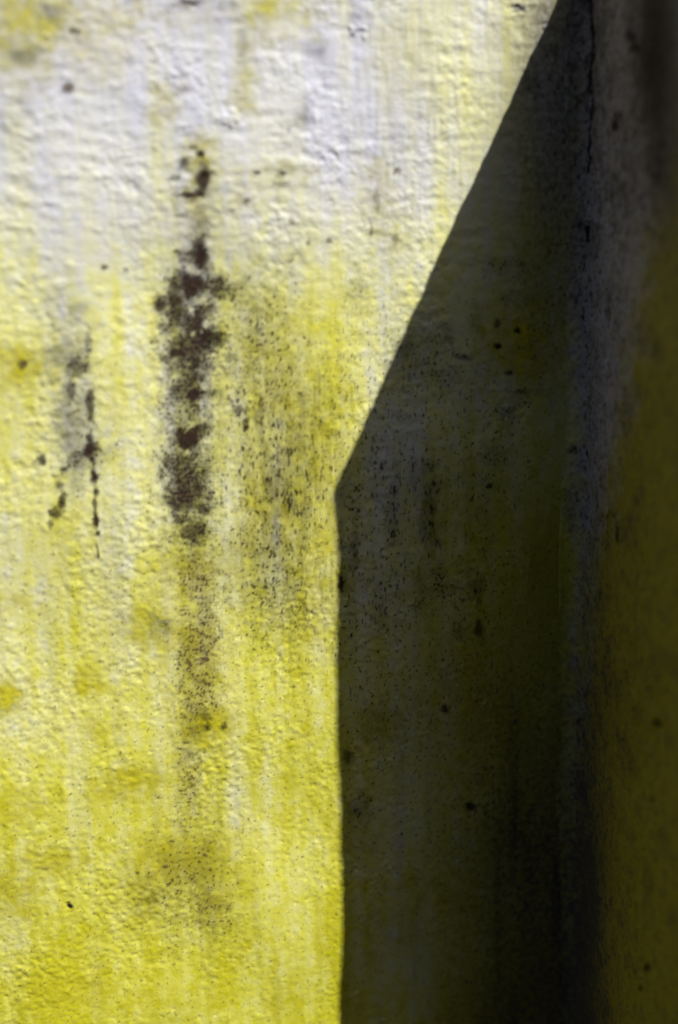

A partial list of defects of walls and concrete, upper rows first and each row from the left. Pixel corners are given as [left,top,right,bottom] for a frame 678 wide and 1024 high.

damp [178,145,211,198]
damp [48,340,118,557]
damp [134,233,327,803]